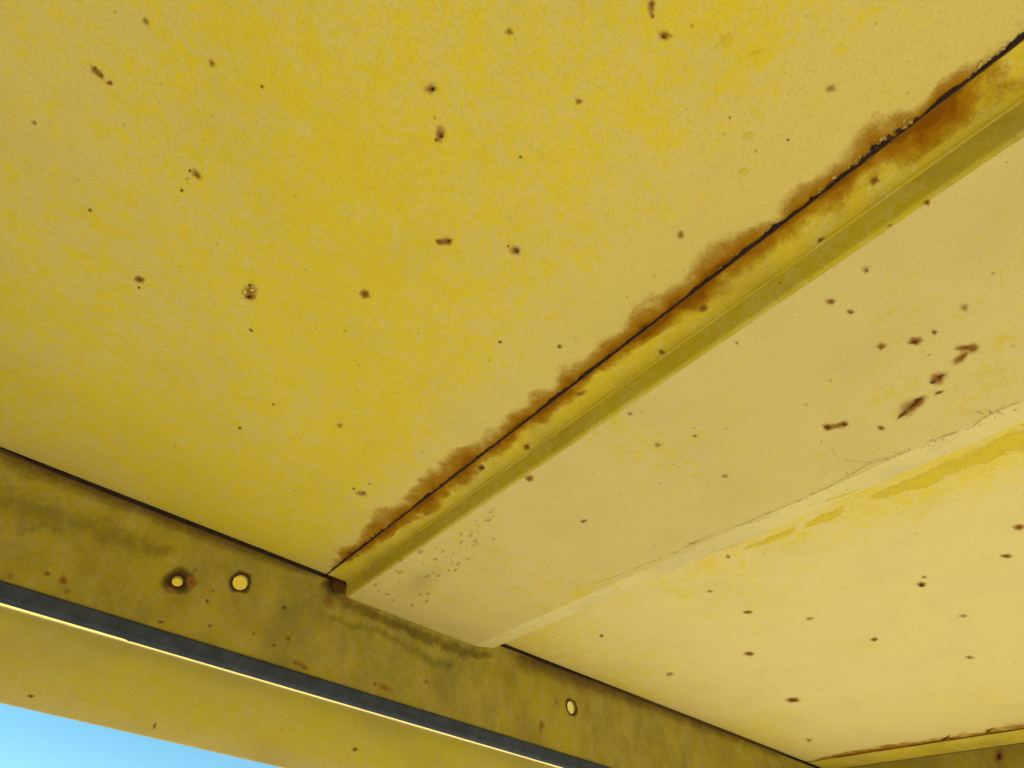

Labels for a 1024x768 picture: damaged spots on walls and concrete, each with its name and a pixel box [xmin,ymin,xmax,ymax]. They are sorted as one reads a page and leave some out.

rust [323,38,1024,606]
leakage [0,449,313,573]
rust [163,569,196,593]